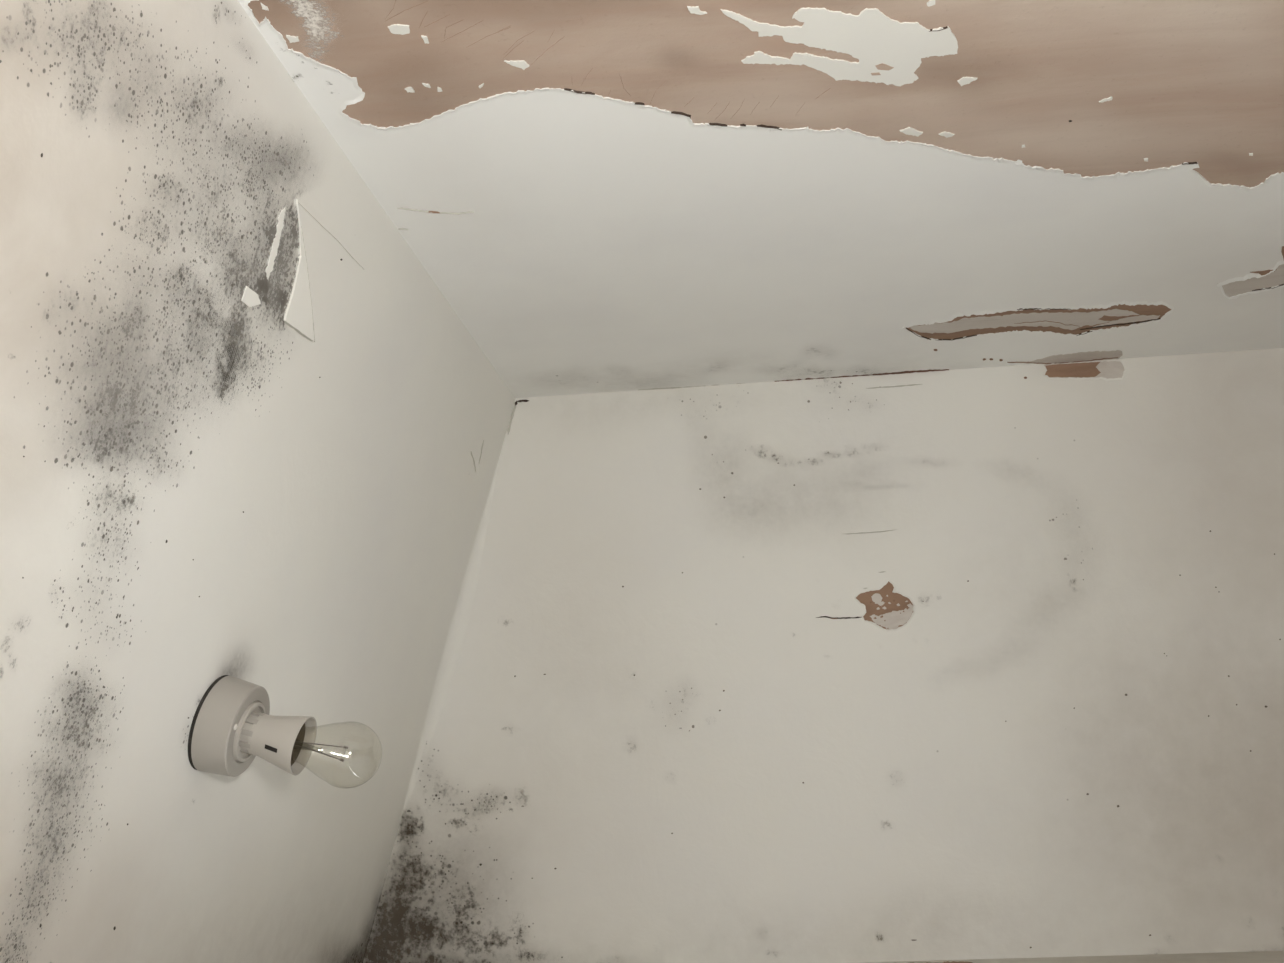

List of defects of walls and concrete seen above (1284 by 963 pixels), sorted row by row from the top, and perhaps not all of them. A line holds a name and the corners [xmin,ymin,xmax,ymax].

peeling [244,0,1284,192]
peeling [901,300,1174,381]
peeling [1217,246,1284,299]
leakage [0,0,311,963]
flaking render [854,580,915,631]
leakage [344,760,534,963]